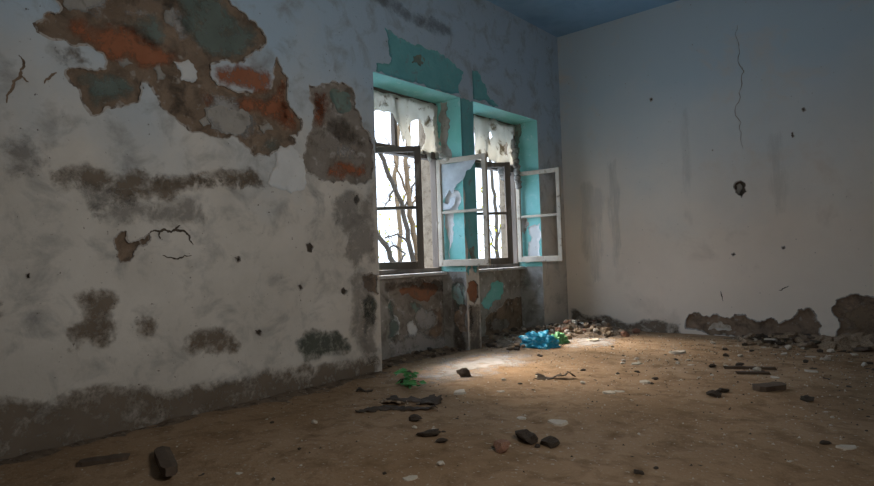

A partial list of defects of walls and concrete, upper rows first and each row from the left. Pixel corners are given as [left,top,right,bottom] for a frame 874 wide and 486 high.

flaking render [33,0,374,205]
peeling [376,28,523,336]
flaking render [733,180,747,198]
crack [148,225,193,260]
flaking render [362,272,445,354]
flaking render [684,307,822,337]
flaking render [831,293,874,336]